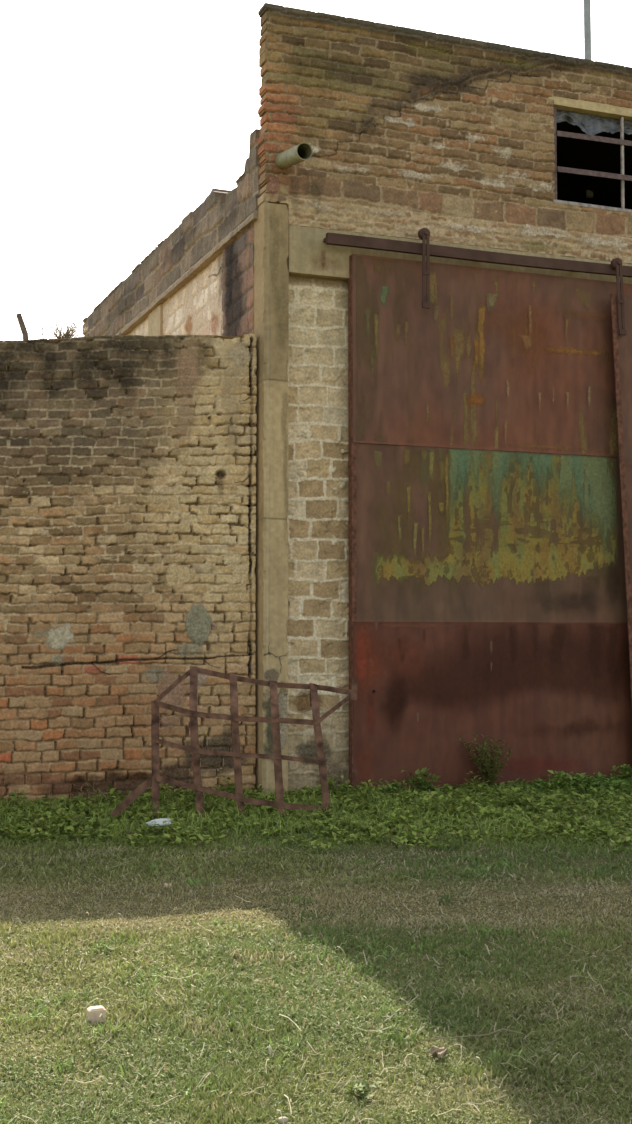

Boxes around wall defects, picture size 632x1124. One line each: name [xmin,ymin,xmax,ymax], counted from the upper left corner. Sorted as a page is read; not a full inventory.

crack [312,73,536,157]
leakage [0,340,56,376]
leakage [71,335,200,430]
crack [243,338,253,401]
peeling [376,273,618,588]
crack [235,451,252,574]
crack [22,640,281,677]